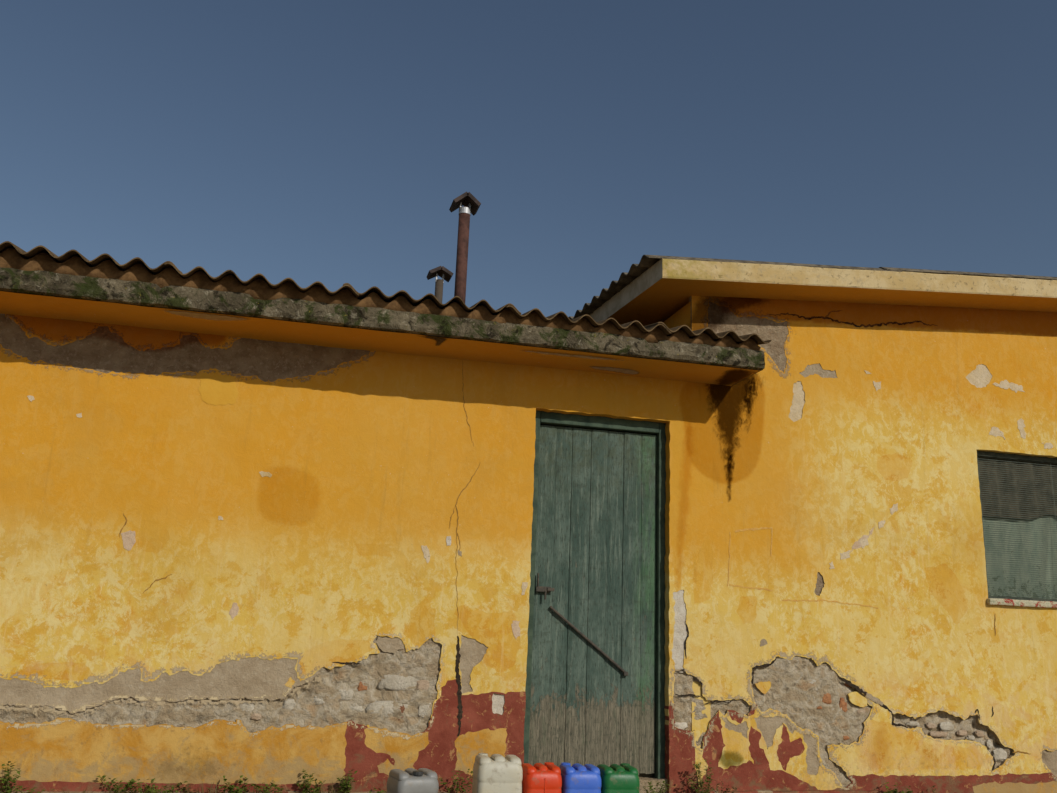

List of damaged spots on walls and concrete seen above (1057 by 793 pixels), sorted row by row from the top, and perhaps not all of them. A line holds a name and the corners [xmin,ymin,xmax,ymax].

peeling [0,314,376,383]
peeling [700,297,837,422]
crack [769,310,938,328]
peeling [966,364,1025,393]
damp [708,370,756,500]
crack [446,361,481,736]
spalling [0,633,445,740]
peeling [459,635,488,693]
spalling [492,693,505,715]
spalling [669,590,1057,790]